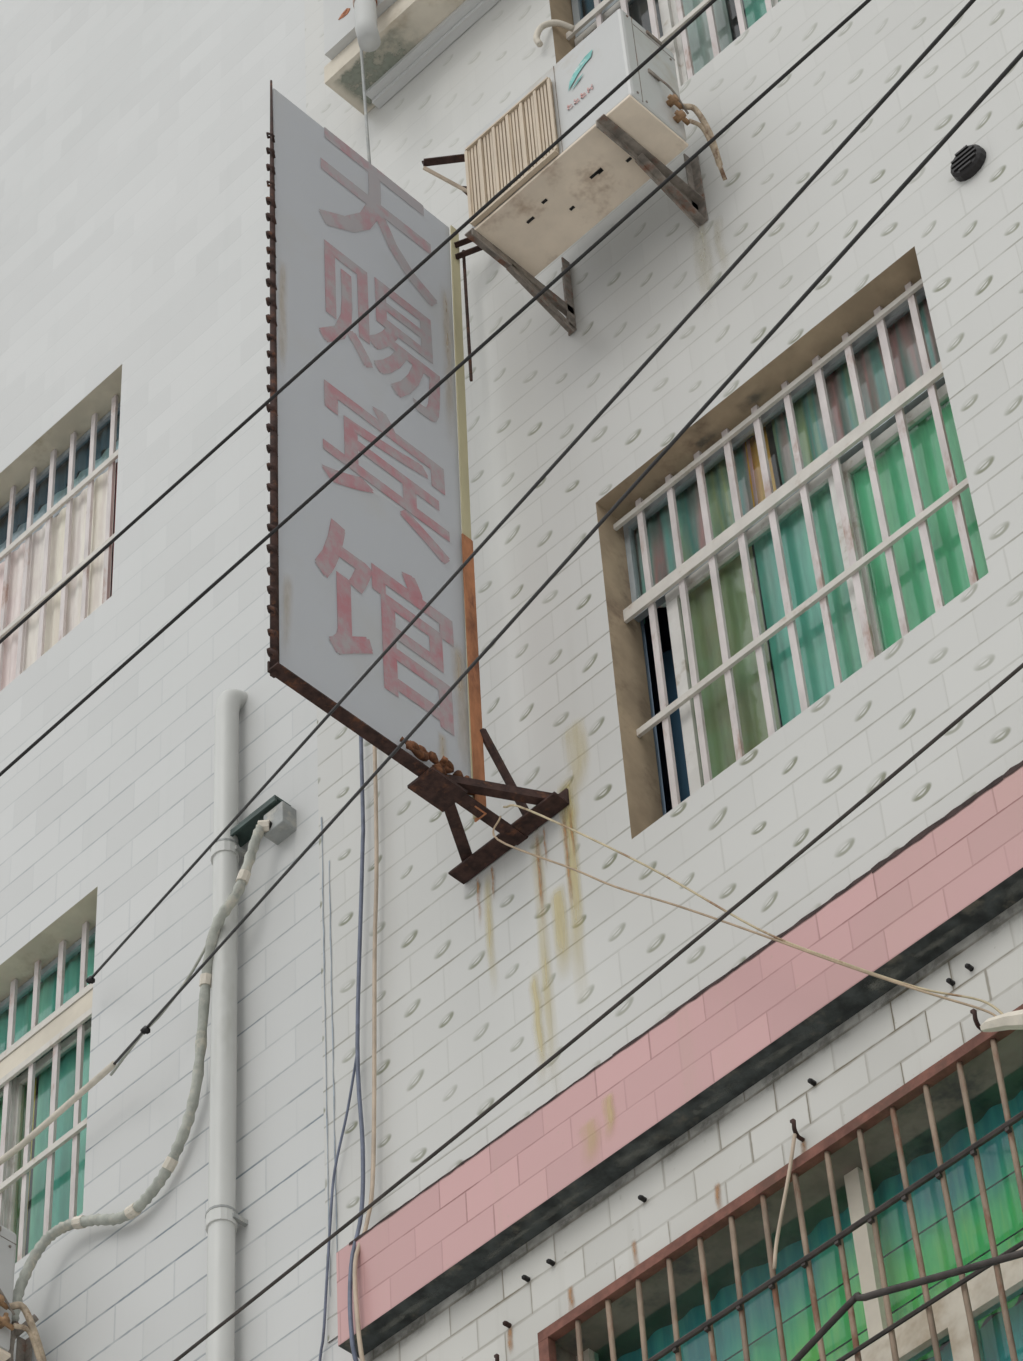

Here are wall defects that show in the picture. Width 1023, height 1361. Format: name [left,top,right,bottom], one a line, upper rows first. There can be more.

rust [537,809,578,944]